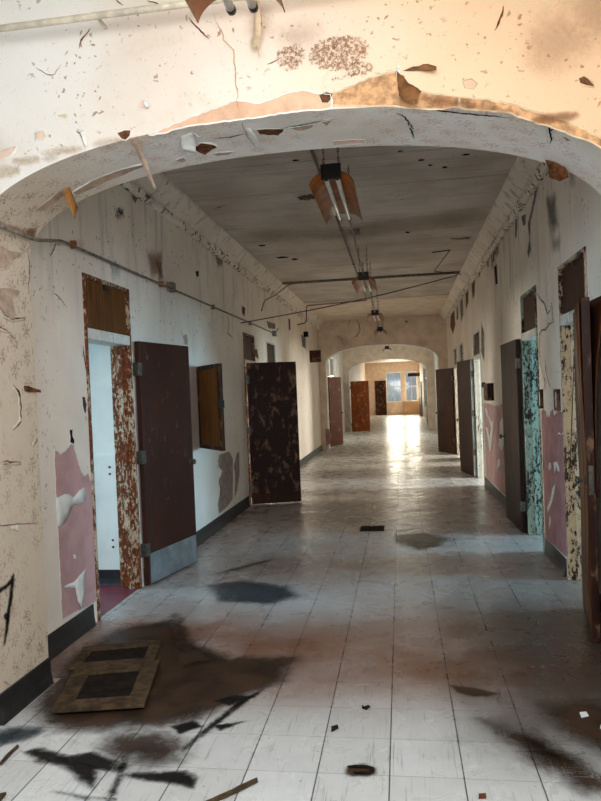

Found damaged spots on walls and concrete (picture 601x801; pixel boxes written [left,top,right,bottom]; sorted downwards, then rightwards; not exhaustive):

crack [213,14,258,150]
damp [277,35,372,80]
peeling [148,64,601,163]
crack [396,113,415,139]
crack [431,110,507,119]
peeling [545,160,569,181]
peeling [54,429,97,620]
peeling [483,403,506,496]
peeling [541,409,567,557]